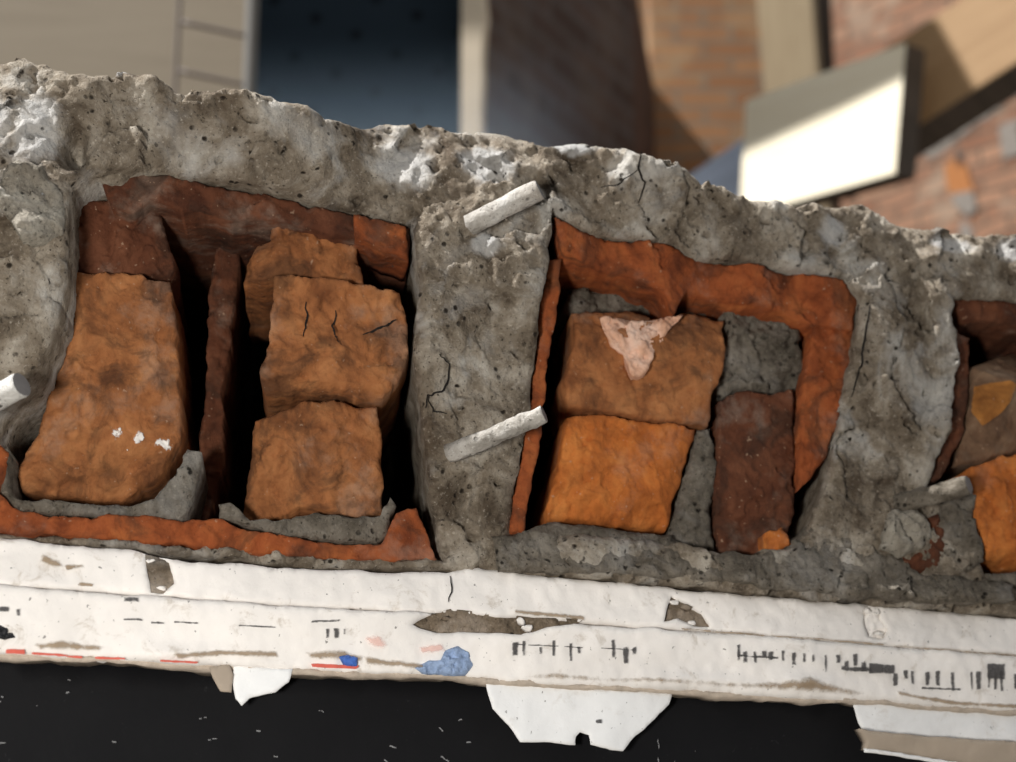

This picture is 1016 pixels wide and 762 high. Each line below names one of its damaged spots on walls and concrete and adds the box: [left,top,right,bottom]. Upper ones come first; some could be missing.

spalling [18,201,200,506]
spalling [243,227,408,521]
spalling [526,311,796,555]
spalling [930,353,1016,574]
spalling [414,609,583,635]
peeling [486,684,672,751]
peeling [853,704,1016,762]